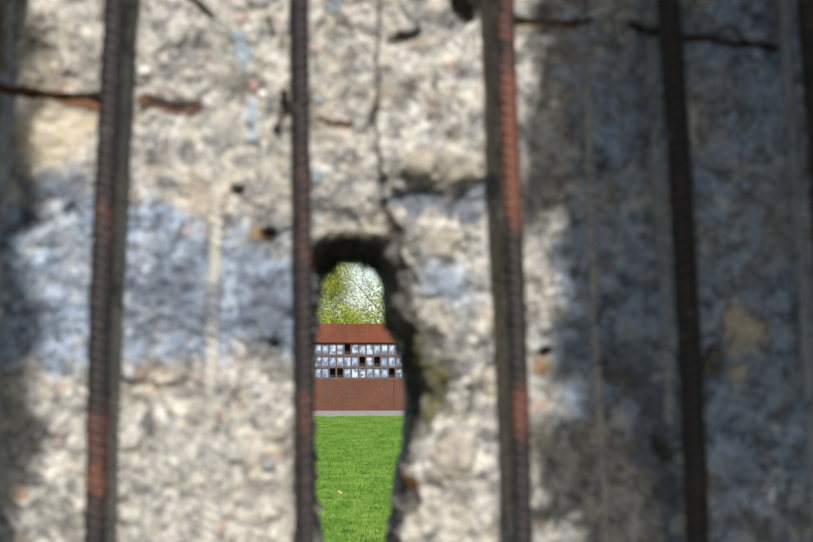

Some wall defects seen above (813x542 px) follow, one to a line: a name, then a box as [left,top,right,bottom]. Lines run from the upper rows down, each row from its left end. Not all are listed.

rust [137,93,203,117]
crack [359,0,404,256]
spalling [387,0,533,542]